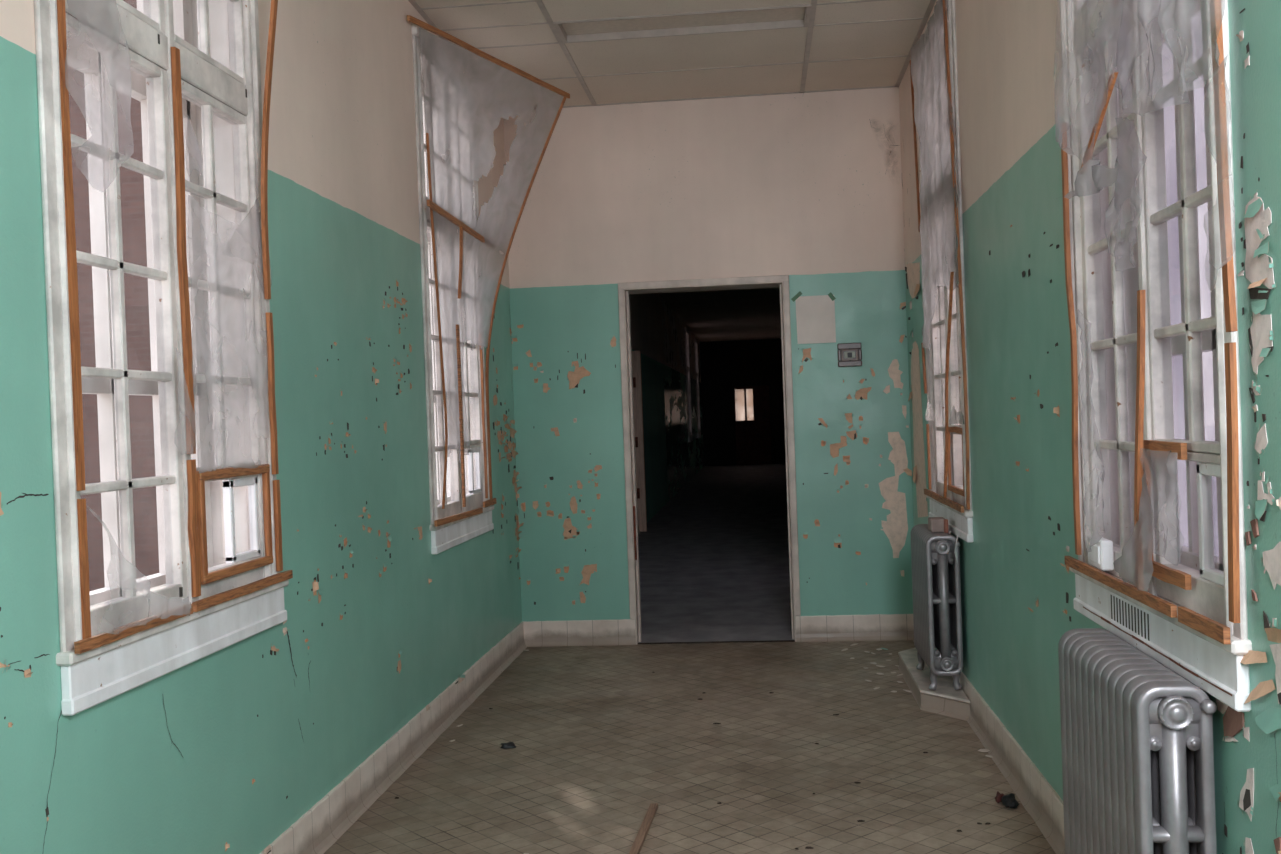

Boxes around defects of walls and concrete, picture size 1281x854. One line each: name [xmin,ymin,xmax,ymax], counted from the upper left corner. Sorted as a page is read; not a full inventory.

peeling [1236,30,1250,68]
peeling [366,279,413,402]
peeling [493,321,602,605]
peeling [818,262,928,577]
peeling [1237,178,1281,590]
peeling [0,659,33,678]
peeling [1216,590,1281,745]
crack [43,710,62,849]
peeling [1240,837,1254,854]
peeling [1237,768,1281,821]